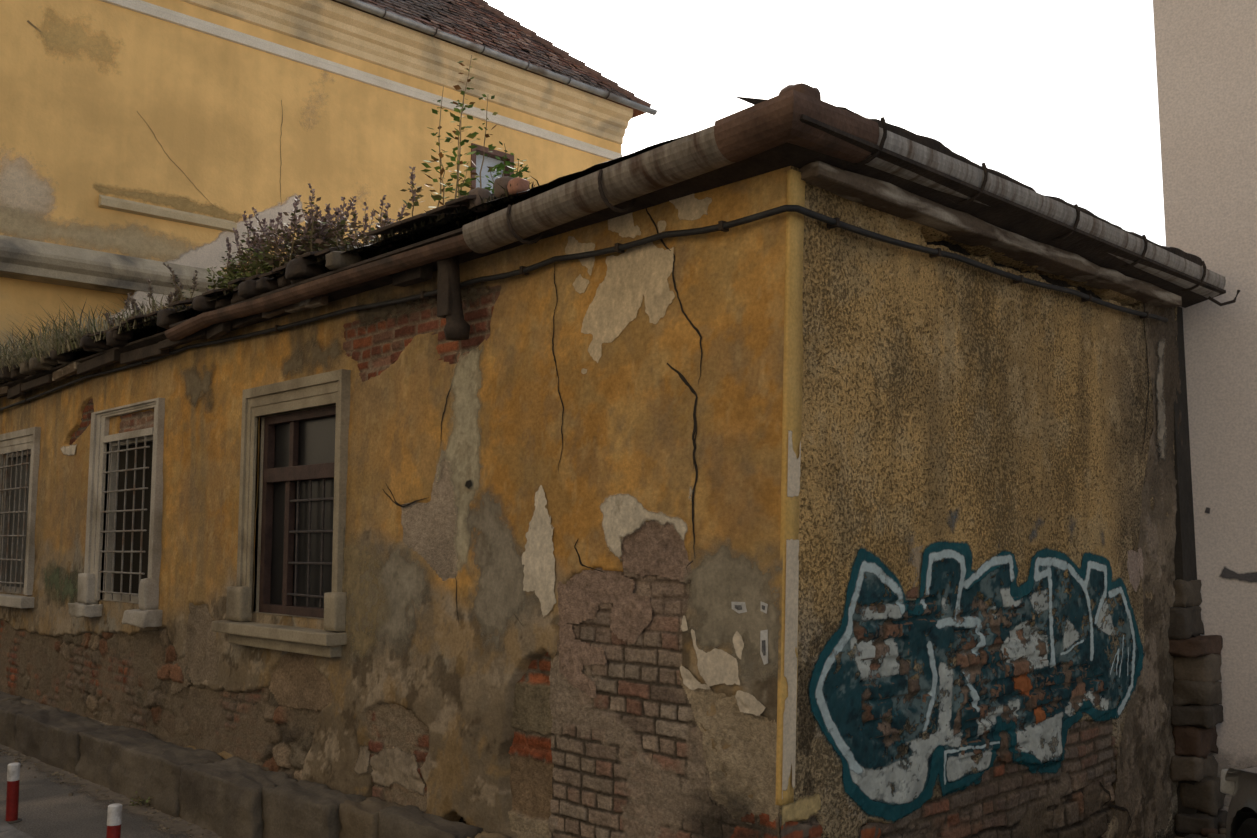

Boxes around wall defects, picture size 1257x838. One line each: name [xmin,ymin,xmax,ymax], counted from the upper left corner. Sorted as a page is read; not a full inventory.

water stain [0,207,193,261]
water stain [95,185,240,222]
flaking render [343,285,501,382]
crack [552,264,564,471]
peeling [565,194,712,374]
crack [646,208,702,575]
peeling [787,430,801,497]
flaking render [853,303,1183,838]
flaking render [508,520,822,838]